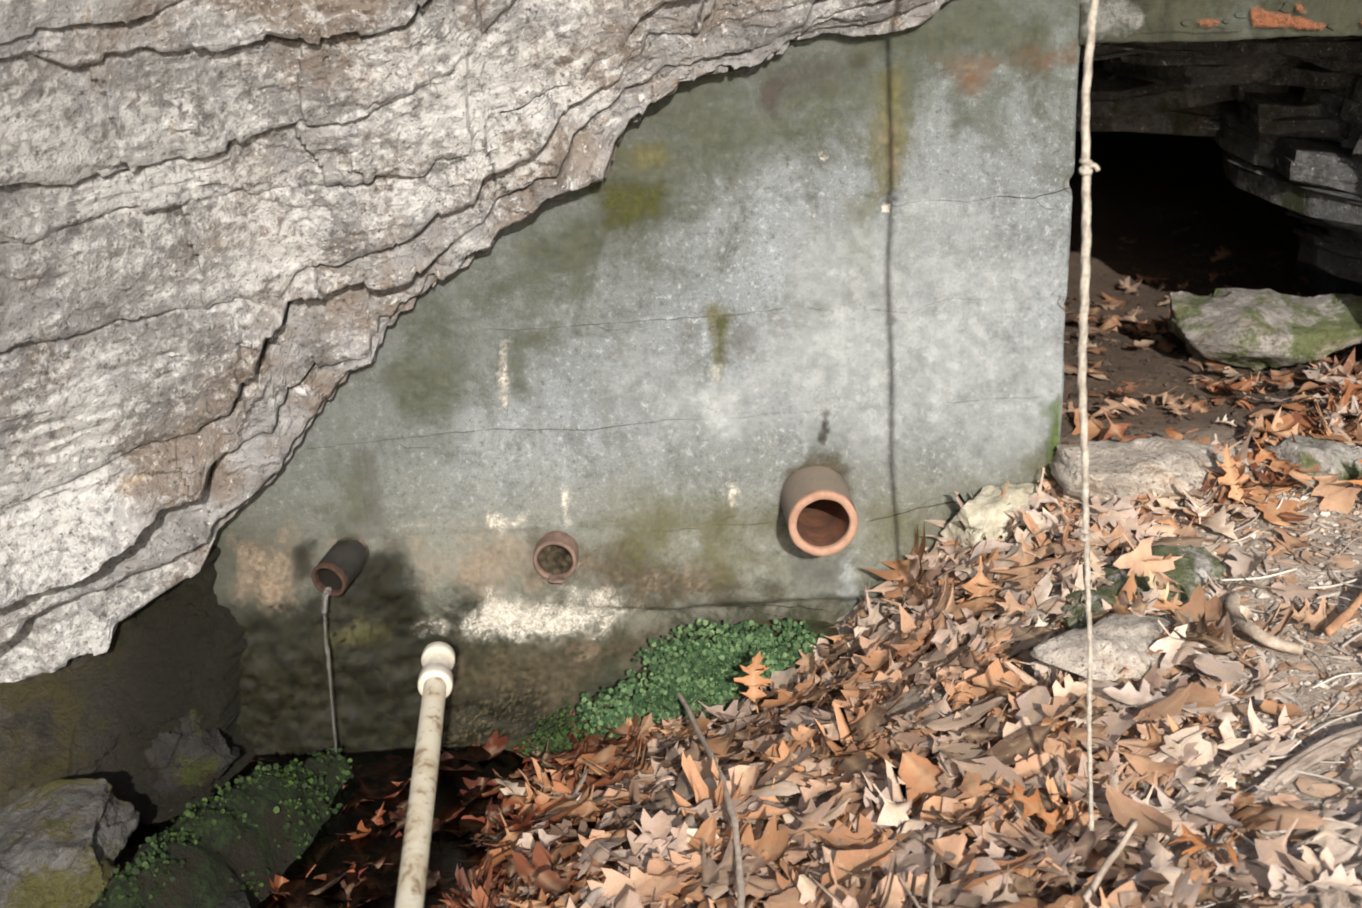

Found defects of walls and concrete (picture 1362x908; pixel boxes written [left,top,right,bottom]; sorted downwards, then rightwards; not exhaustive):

water stain [872,73,906,193]
water stain [247,544,312,596]
water stain [236,555,446,779]
water stain [440,512,644,755]